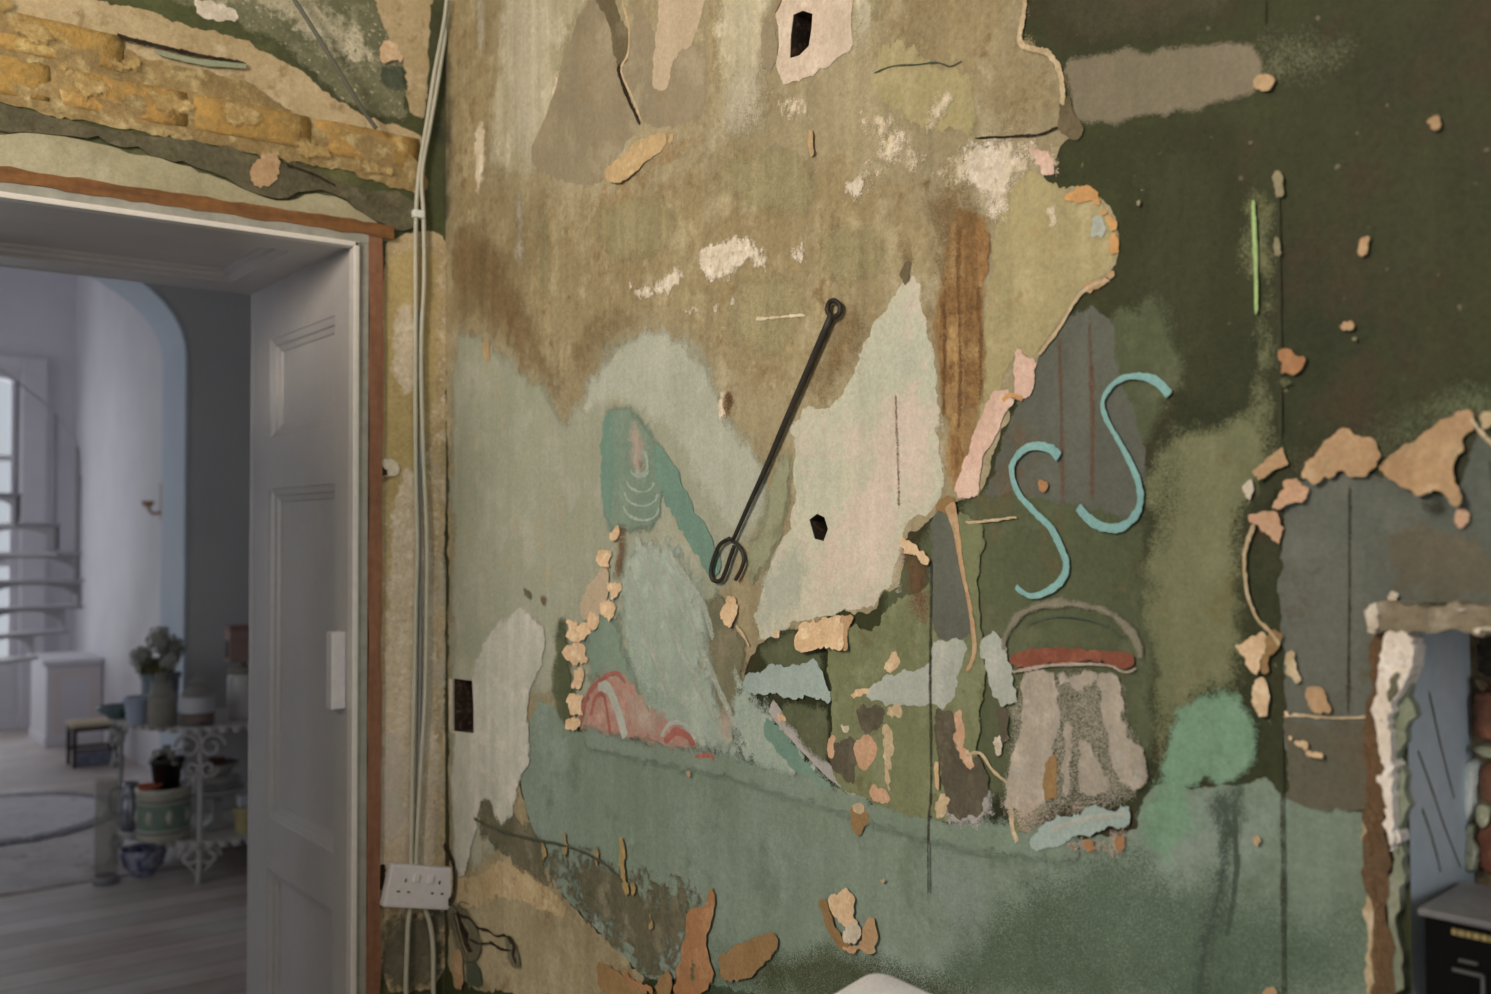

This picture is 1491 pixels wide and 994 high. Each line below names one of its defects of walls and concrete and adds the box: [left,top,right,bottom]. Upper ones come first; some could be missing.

crack [117,33,246,69]
water stain [171,0,408,121]
crack [617,64,640,125]
peeling [0,0,1119,994]
spalling [1365,591,1426,851]